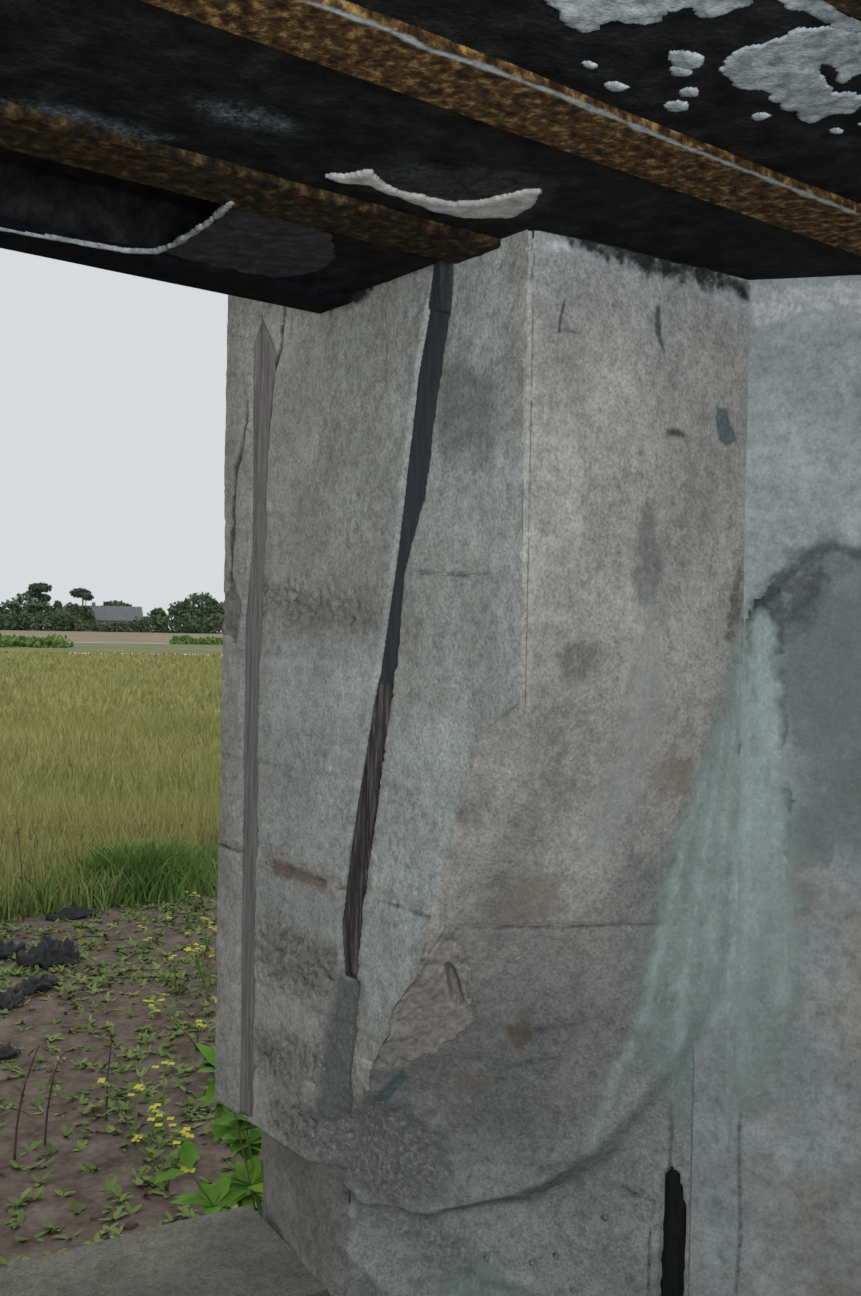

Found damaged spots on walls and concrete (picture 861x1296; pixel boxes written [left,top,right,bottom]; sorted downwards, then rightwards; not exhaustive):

peeling [544,0,753,33]
peeling [581,61,598,70]
peeling [604,81,630,92]
peeling [663,50,705,112]
peeling [718,0,861,134]
peeling [325,164,546,219]
crack [231,307,286,582]
leakage [638,557,861,1124]
spalling [306,927,475,1209]